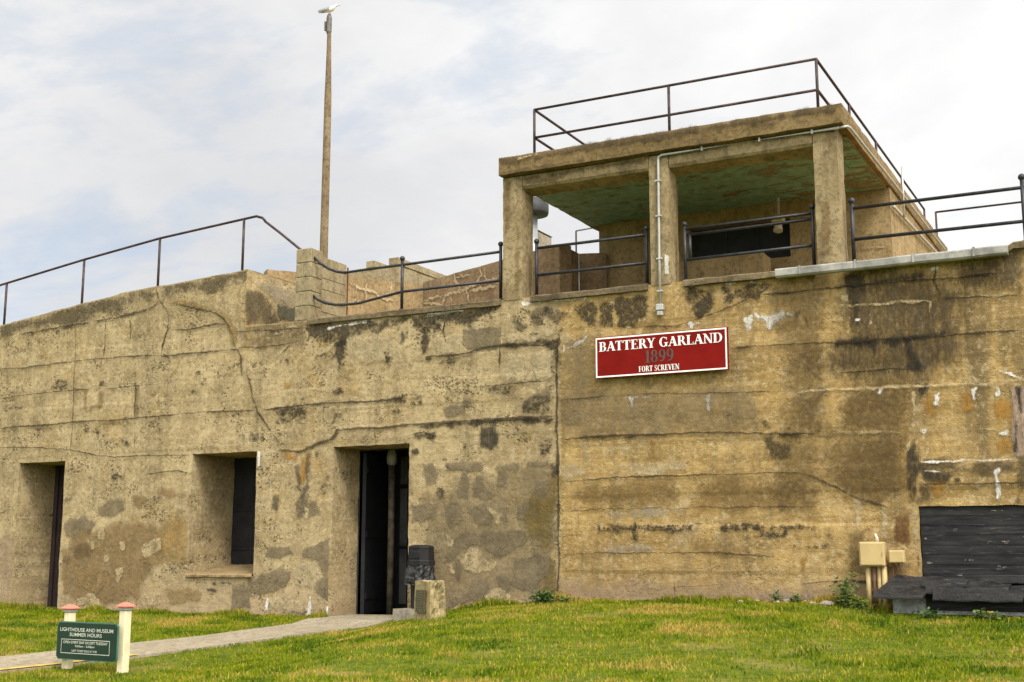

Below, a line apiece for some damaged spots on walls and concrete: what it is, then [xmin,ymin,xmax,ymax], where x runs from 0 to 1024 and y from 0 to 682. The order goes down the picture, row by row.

crack [0,265,1024,595]
leakage [504,297,798,459]
leakage [830,269,1024,543]